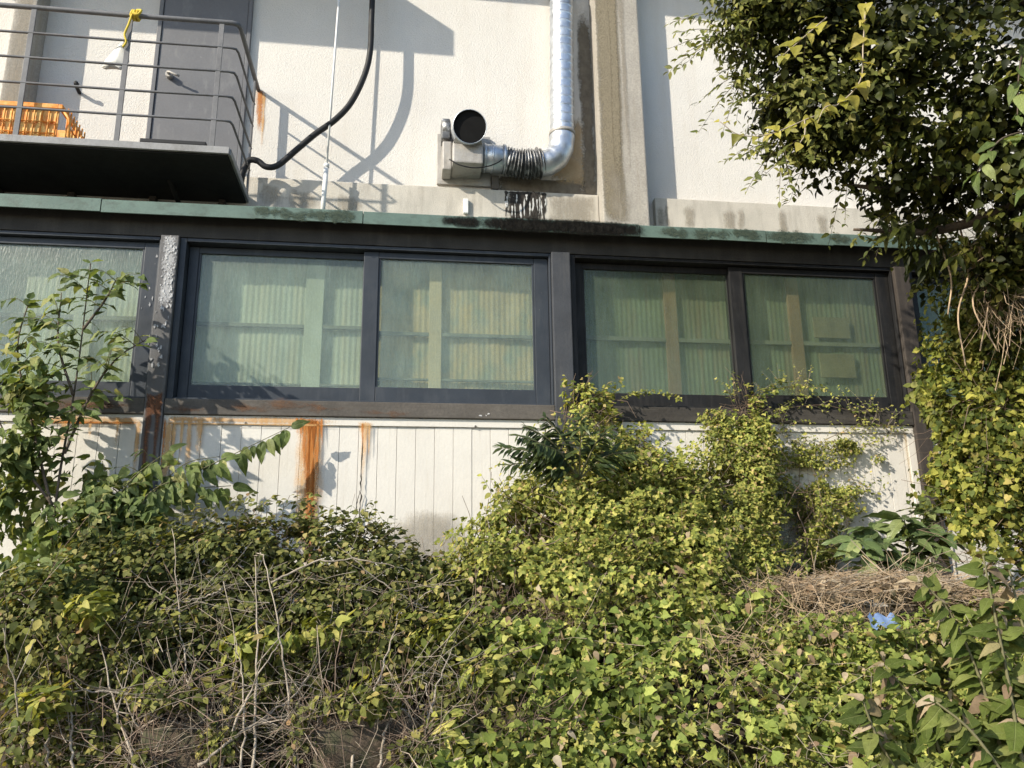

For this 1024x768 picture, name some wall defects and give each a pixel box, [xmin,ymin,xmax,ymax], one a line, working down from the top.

corrosion [257,91,266,130]
water stain [442,0,641,236]
peeling [141,236,177,368]
corrosion [43,393,326,527]
corrosion [361,423,370,455]